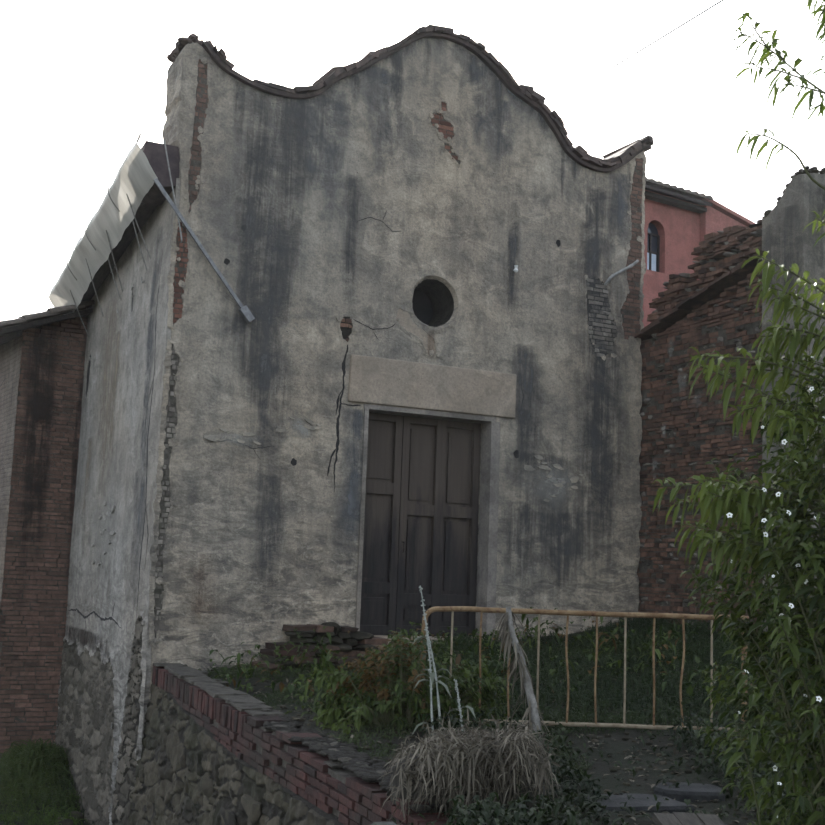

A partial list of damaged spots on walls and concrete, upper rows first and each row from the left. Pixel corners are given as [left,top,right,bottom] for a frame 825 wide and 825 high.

damp [247,86,343,197]
flaking render [426,98,465,168]
crack [68,250,163,629]
flaking render [55,55,212,825]
damp [232,194,296,449]
crack [327,345,361,492]
flaking render [336,313,359,346]
damp [506,347,583,576]
damp [577,173,630,512]
flaking render [583,155,647,364]